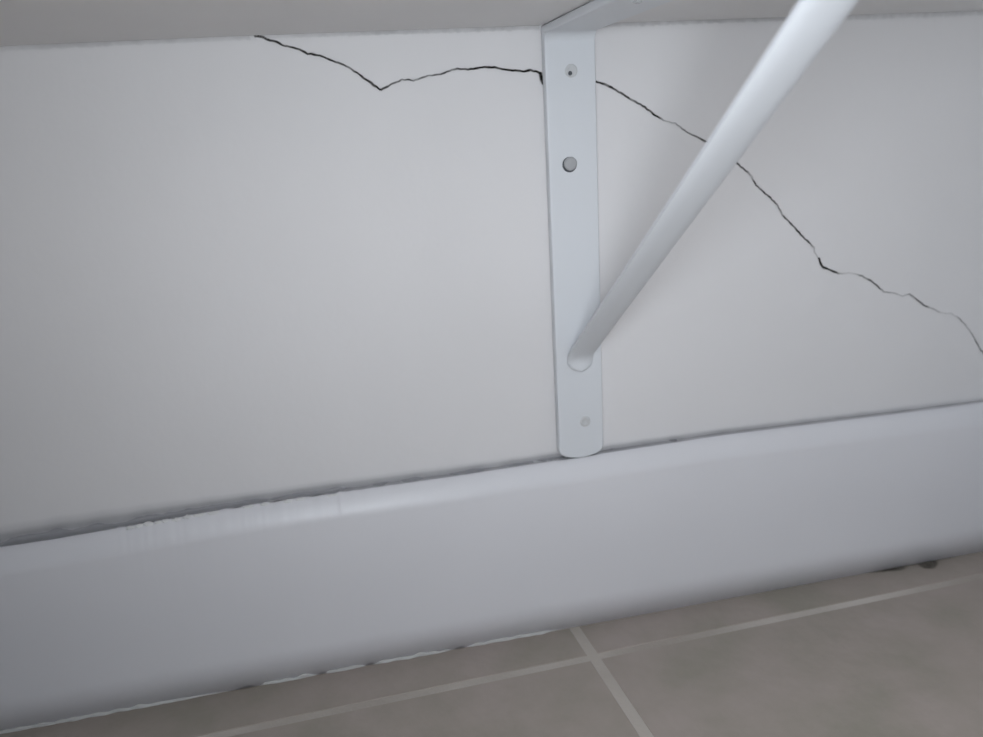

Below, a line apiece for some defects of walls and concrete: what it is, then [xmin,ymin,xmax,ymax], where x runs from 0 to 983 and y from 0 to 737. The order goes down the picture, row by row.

crack [254,35,543,91]
crack [596,81,661,119]
crack [736,163,882,290]